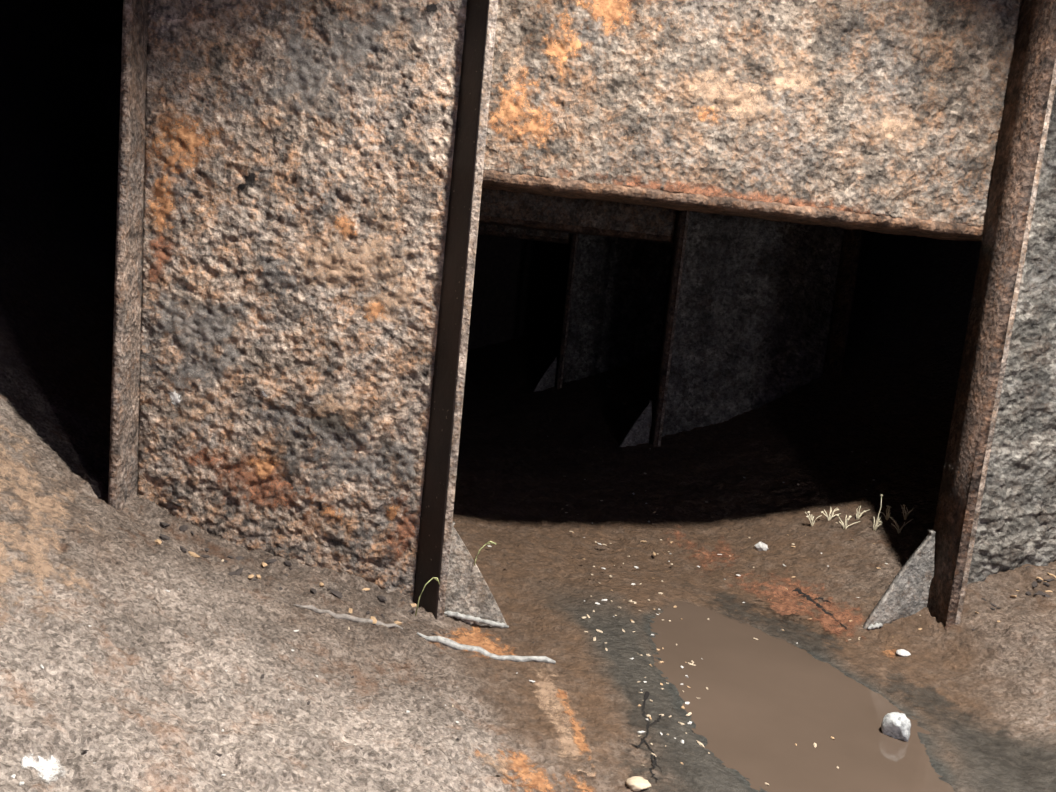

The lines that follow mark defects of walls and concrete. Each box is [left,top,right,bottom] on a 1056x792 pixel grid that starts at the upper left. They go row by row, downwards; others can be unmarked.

corrosion [543,0,650,82]
corrosion [488,48,559,148]
corrosion [147,114,224,281]
corrosion [186,446,344,526]